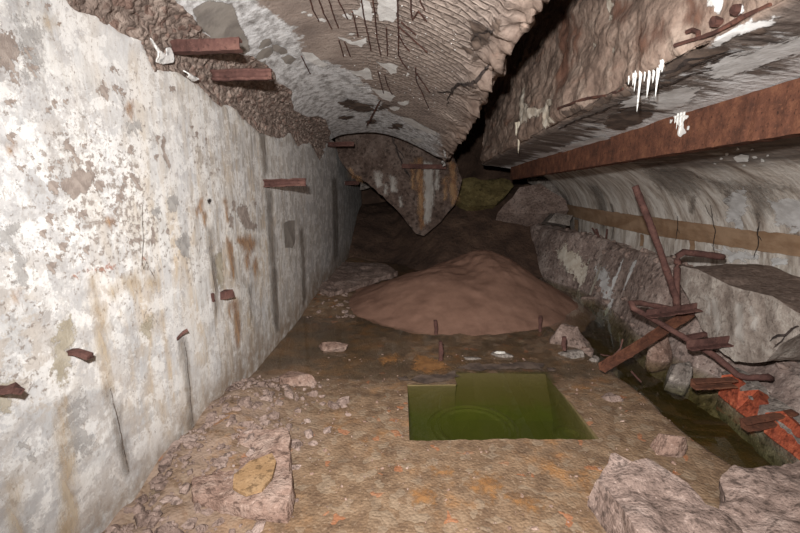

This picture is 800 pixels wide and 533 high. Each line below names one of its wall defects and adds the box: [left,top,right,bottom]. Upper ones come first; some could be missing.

spalling [66,0,331,160]
leakage [302,52,328,68]
leakage [338,33,367,47]
crack [437,64,490,104]
spalling [462,17,501,61]
spalling [557,80,639,118]
spalling [584,109,653,130]
leakage [620,86,704,137]
spalling [660,3,772,85]
peeling [154,134,171,169]
leakage [267,193,279,326]
corrosion [229,302,240,347]